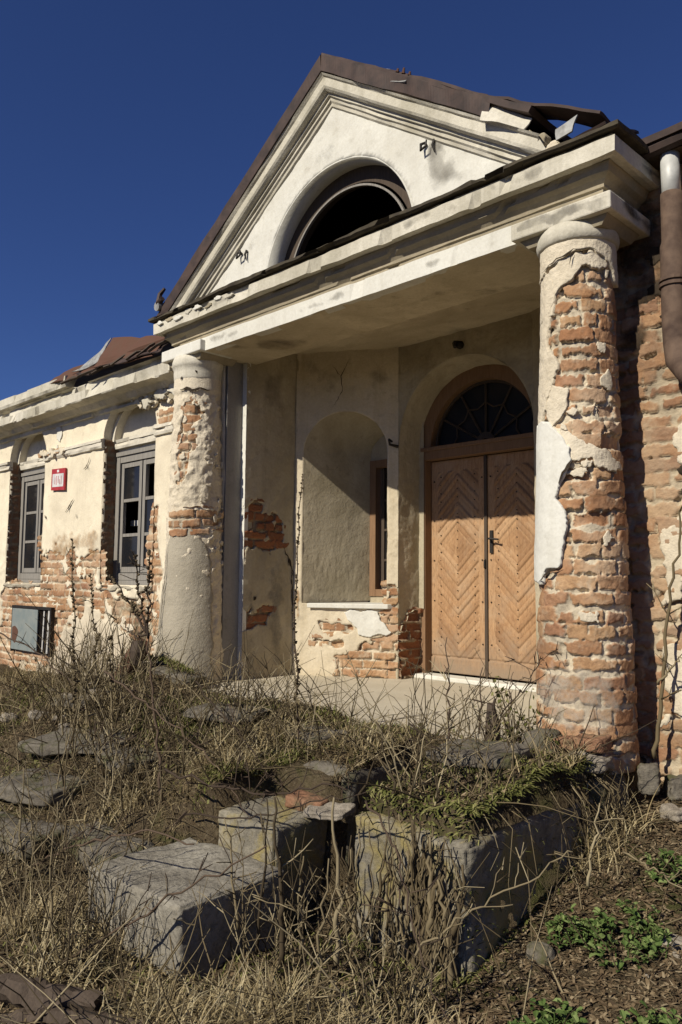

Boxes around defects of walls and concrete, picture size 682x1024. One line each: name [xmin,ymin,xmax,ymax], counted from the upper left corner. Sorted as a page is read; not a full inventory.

spalling [645,246,660,266]
flaking render [534,238,623,585]
flaking render [672,423,682,475]
flaking render [0,396,224,671]
flaking render [241,498,289,557]
flaking render [660,511,682,607]
flaking render [239,597,277,634]
flaking render [308,580,424,679]
flaking render [577,611,599,623]
flaking render [656,643,682,727]